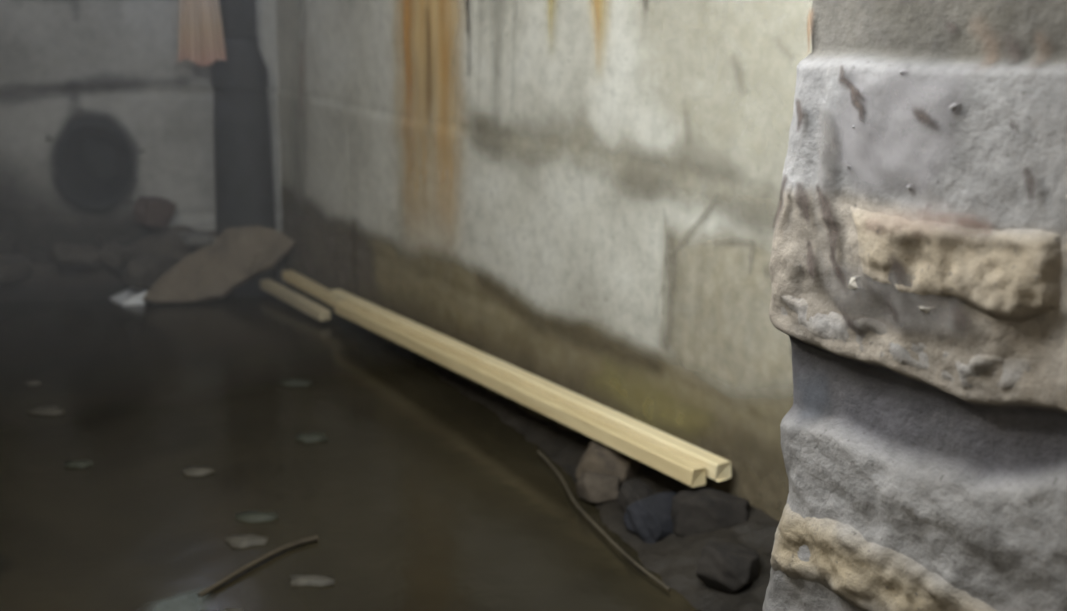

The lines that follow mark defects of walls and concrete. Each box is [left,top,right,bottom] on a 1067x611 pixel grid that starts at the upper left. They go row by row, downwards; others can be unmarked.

rust [402,0,457,176]
damp [282,117,825,522]